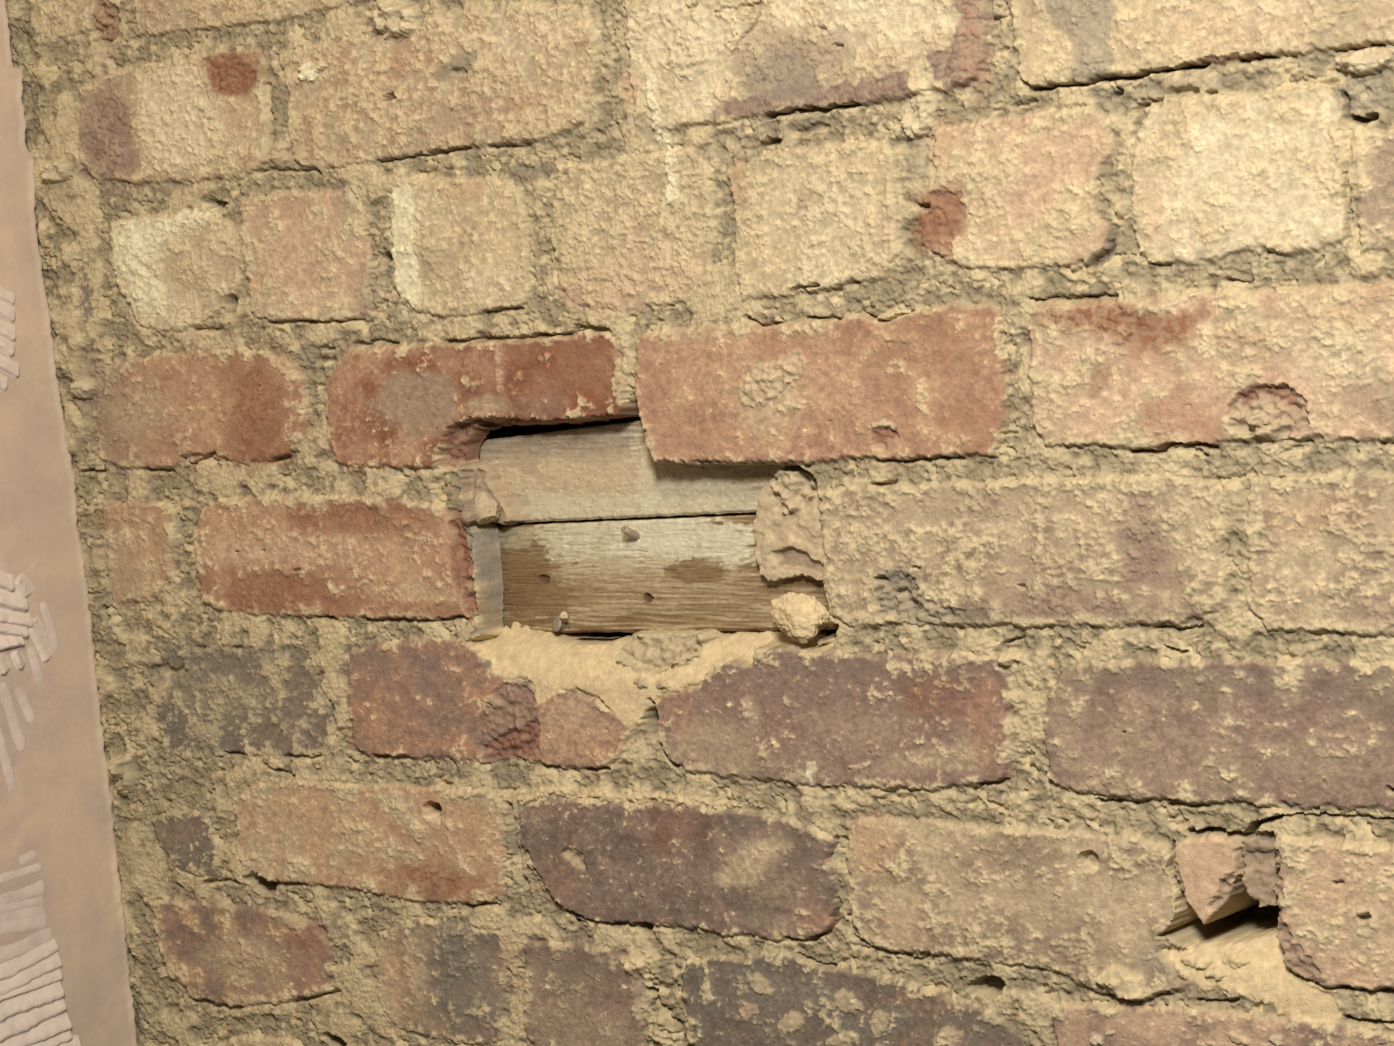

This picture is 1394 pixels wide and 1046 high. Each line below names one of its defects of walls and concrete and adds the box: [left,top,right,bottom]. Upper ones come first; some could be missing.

spalling [437,390,645,471]
spalling [1225,382,1310,440]
spalling [657,461,821,520]
spalling [446,518,504,635]
spalling [476,678,541,761]
spalling [1158,830,1337,986]